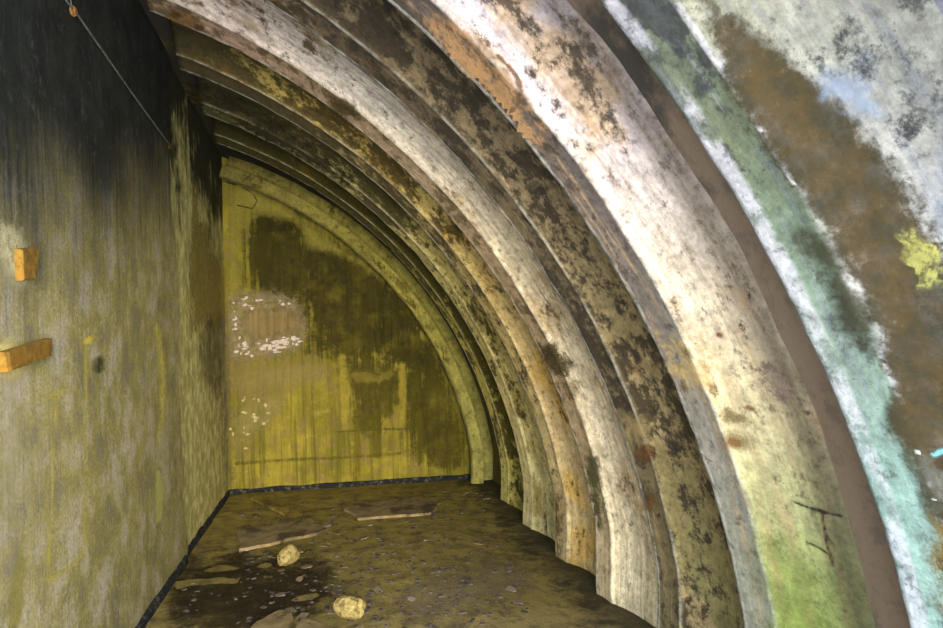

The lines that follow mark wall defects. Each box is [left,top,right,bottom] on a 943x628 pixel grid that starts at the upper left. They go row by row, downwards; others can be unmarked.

damp [340,352,467,472]
corrosion [702,0,943,573]